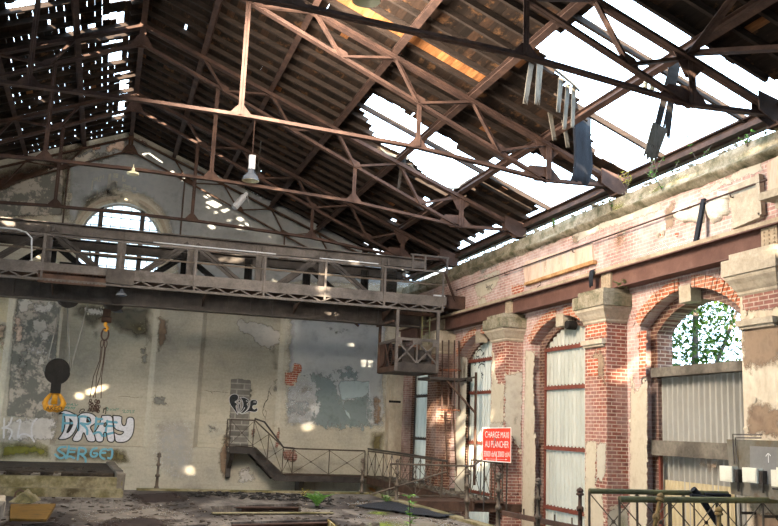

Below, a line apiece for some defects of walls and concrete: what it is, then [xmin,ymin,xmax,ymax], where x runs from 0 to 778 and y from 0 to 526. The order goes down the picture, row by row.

peeling [237,319,280,350]
spalling [4,299,63,442]
peeling [285,363,372,431]
peeling [490,350,536,526]
peeling [743,395,778,441]